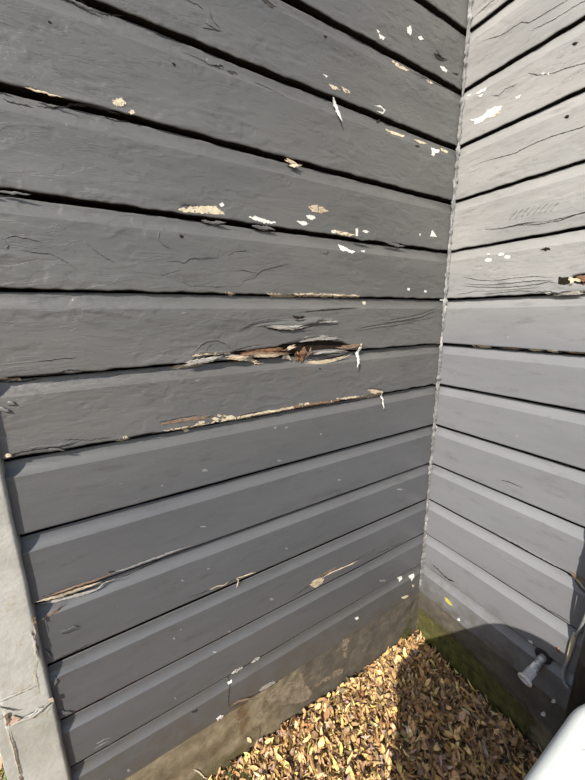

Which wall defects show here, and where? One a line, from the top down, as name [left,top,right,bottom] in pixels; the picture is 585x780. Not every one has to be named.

crack [71,0,123,16]
crack [484,1,585,41]
crack [185,53,238,75]
crack [3,87,128,122]
peeling [323,74,350,121]
crack [480,126,584,163]
peeling [179,199,226,226]
peeling [297,205,328,226]
crack [487,201,585,229]
peeling [331,228,369,254]
spalling [266,341,347,354]
peeling [113,388,384,442]